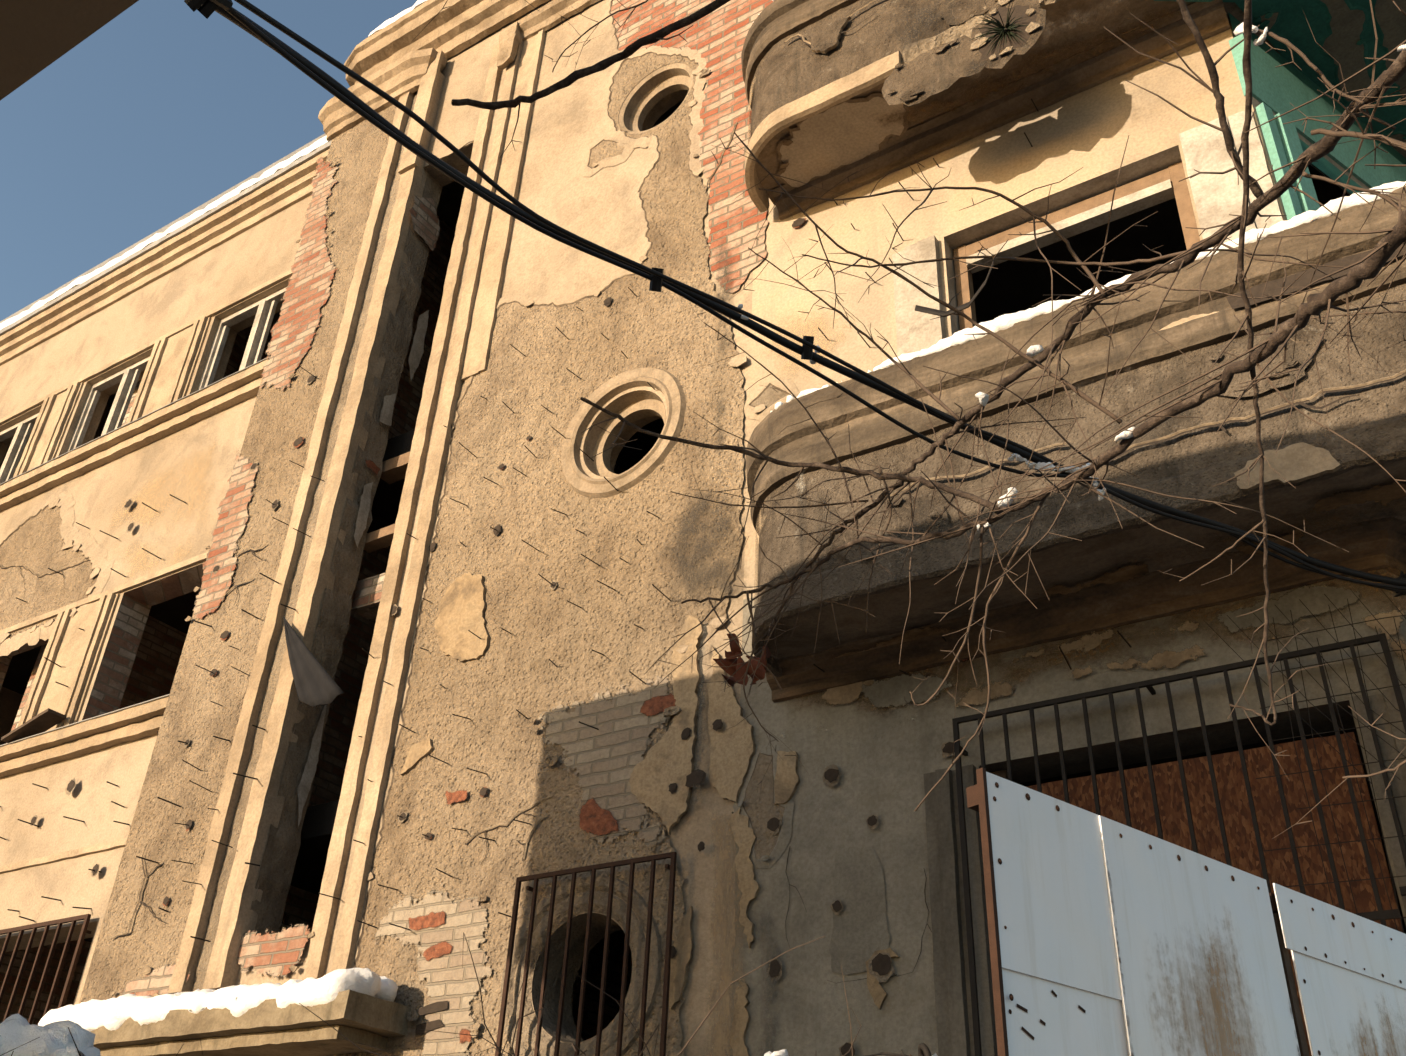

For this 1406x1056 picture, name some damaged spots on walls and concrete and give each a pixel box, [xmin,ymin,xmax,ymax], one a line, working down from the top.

peeling [776,0,1046,188]
peeling [1254,10,1281,31]
peeling [1315,0,1406,107]
peeling [1381,131,1406,158]
flaking render [259,157,338,391]
flaking render [1234,442,1341,492]
flaking render [0,487,114,656]
flaking render [185,450,258,622]
spalling [333,0,800,1056]
peeling [821,673,952,708]
flaking render [236,924,314,979]
corrosion [1183,948,1244,1056]